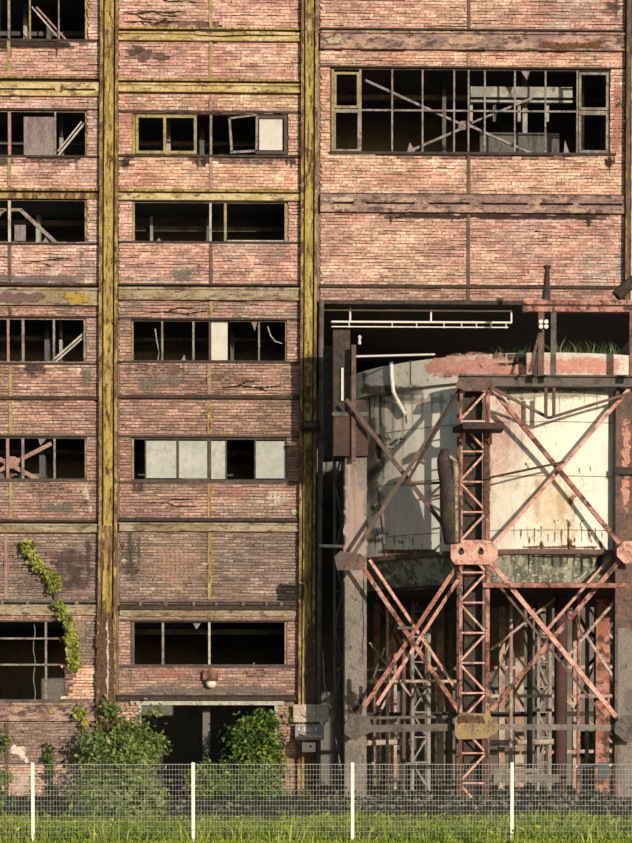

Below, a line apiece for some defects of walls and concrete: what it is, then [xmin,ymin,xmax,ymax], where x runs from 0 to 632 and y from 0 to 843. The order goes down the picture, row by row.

rust [536,39,606,51]
peeling [0,291,46,304]
peeling [65,292,92,304]
peeling [424,353,534,377]
peeling [549,357,621,375]
leakage [370,418,406,482]
rust [520,495,603,549]
leakage [528,554,603,574]
leakage [344,679,363,719]